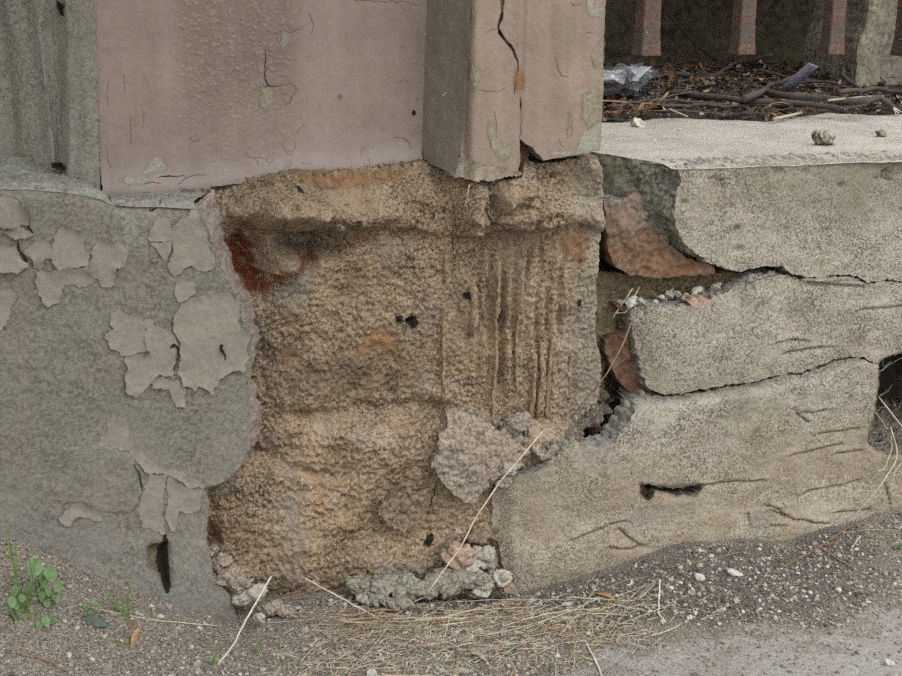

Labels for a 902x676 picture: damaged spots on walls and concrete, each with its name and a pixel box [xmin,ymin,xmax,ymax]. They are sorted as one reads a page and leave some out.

crack [477,0,522,137]
peeling [0,288,17,330]
peeling [0,196,128,307]
spalling [98,86,606,595]
crack [599,260,618,270]
peeling [58,503,102,527]